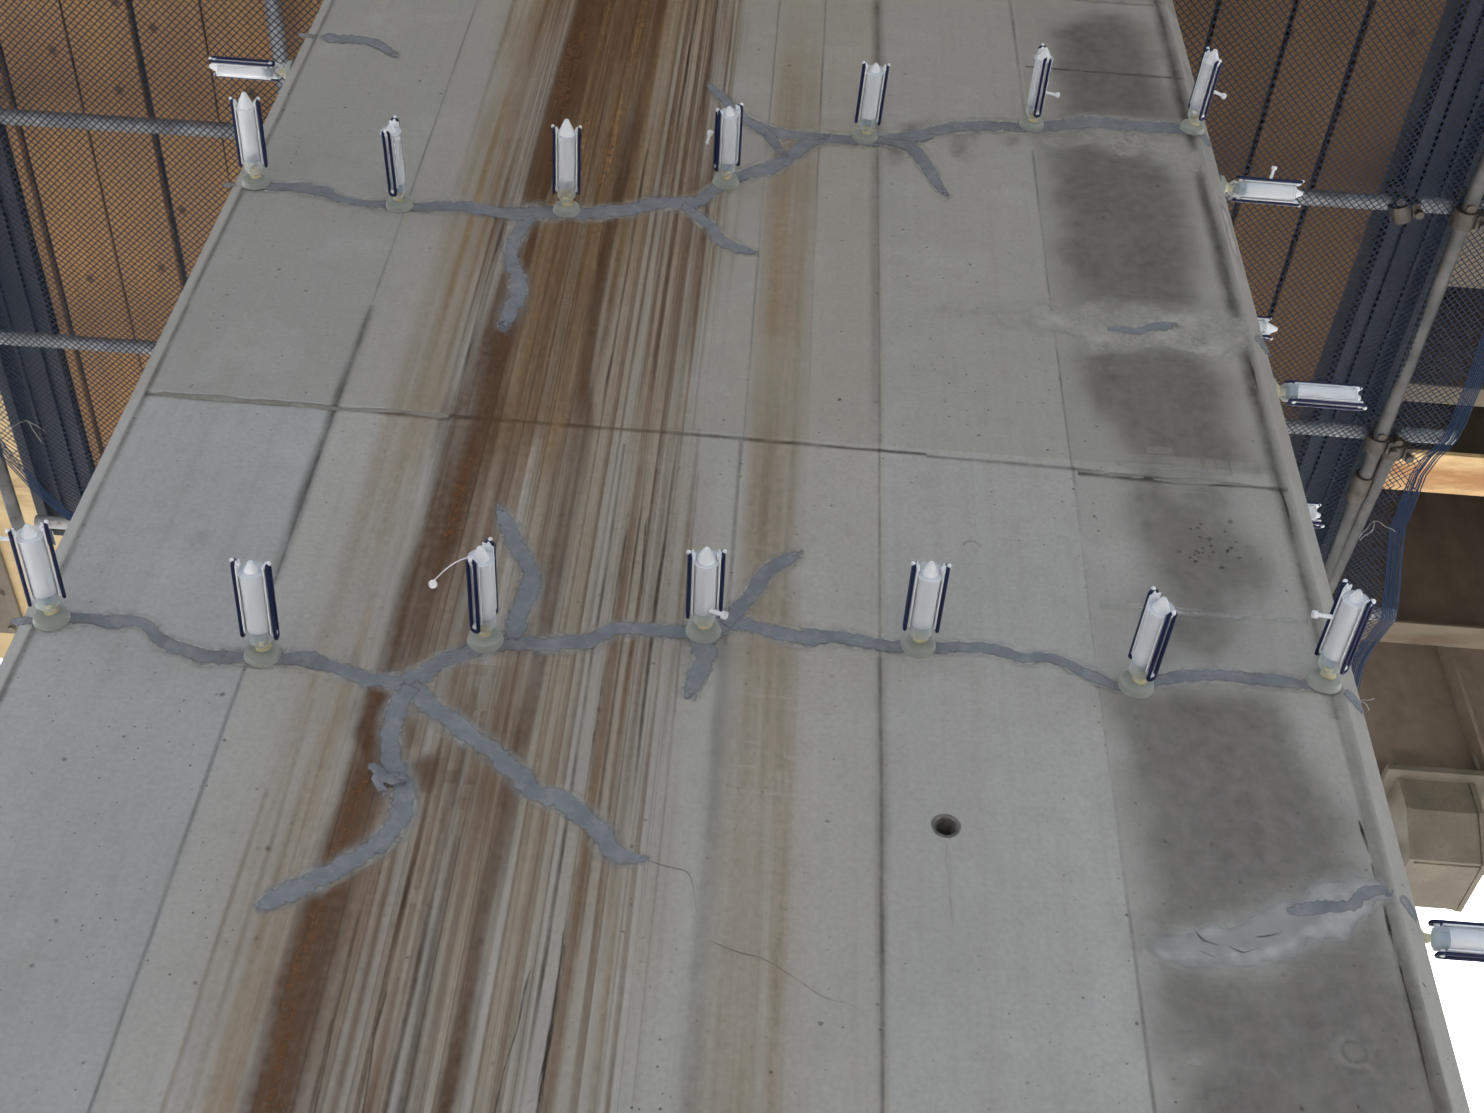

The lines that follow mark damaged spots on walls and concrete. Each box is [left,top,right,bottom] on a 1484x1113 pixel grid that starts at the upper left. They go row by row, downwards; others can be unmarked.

crack [298,33,398,58]
rust [663,5,698,174]
crack [222,83,1212,332]
leakage [1221,208,1238,257]
leakage [998,241,1248,380]
crack [1107,322,1177,334]
crack [1251,335,1272,380]
rust [247,0,667,1113]
crack [10,504,1365,912]
spalling [1154,878,1417,966]